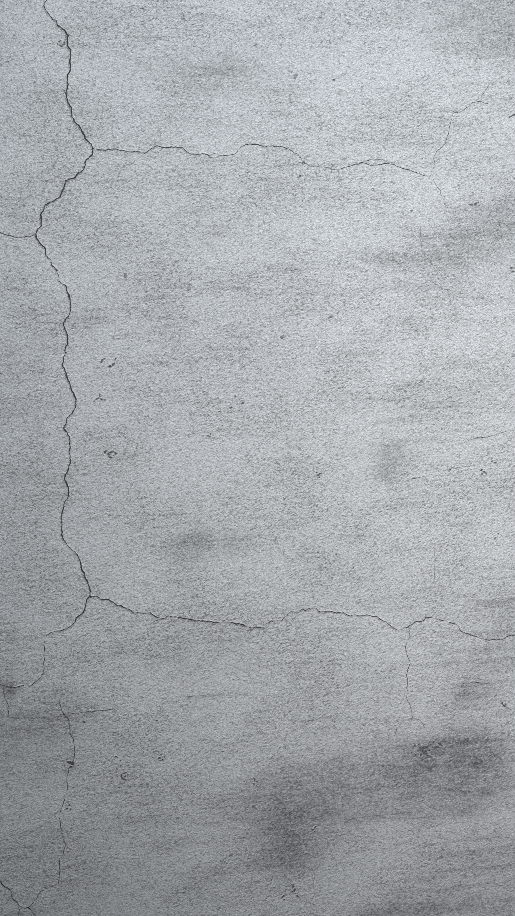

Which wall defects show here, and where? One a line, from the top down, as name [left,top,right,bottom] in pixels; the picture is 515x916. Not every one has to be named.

crack [0,0,513,731]
crack [0,697,110,916]